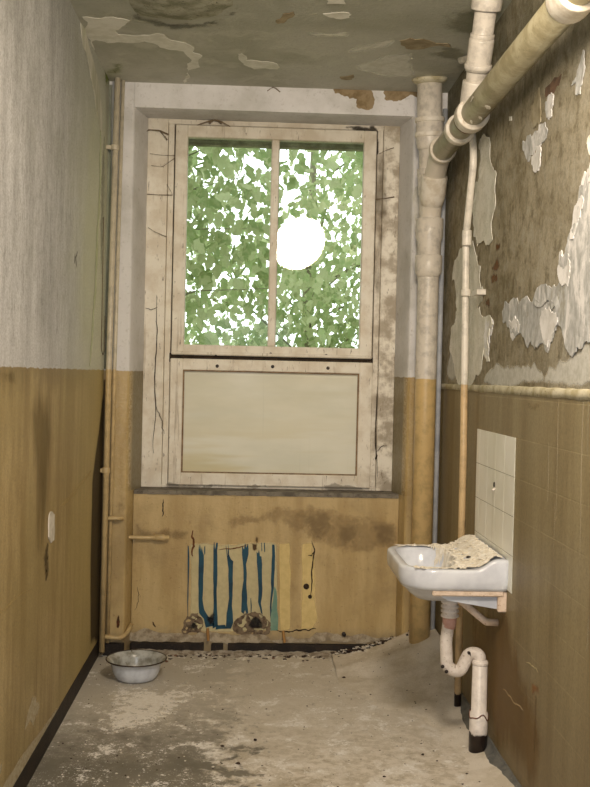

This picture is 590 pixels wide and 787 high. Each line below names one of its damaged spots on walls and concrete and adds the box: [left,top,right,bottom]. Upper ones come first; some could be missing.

peeling [323,0,351,19]
peeling [238,53,280,69]
peeling [333,75,417,110]
peeling [400,38,451,50]
peeling [571,49,586,95]
flaking render [522,74,562,173]
peeling [449,134,590,385]
crack [146,298,164,453]